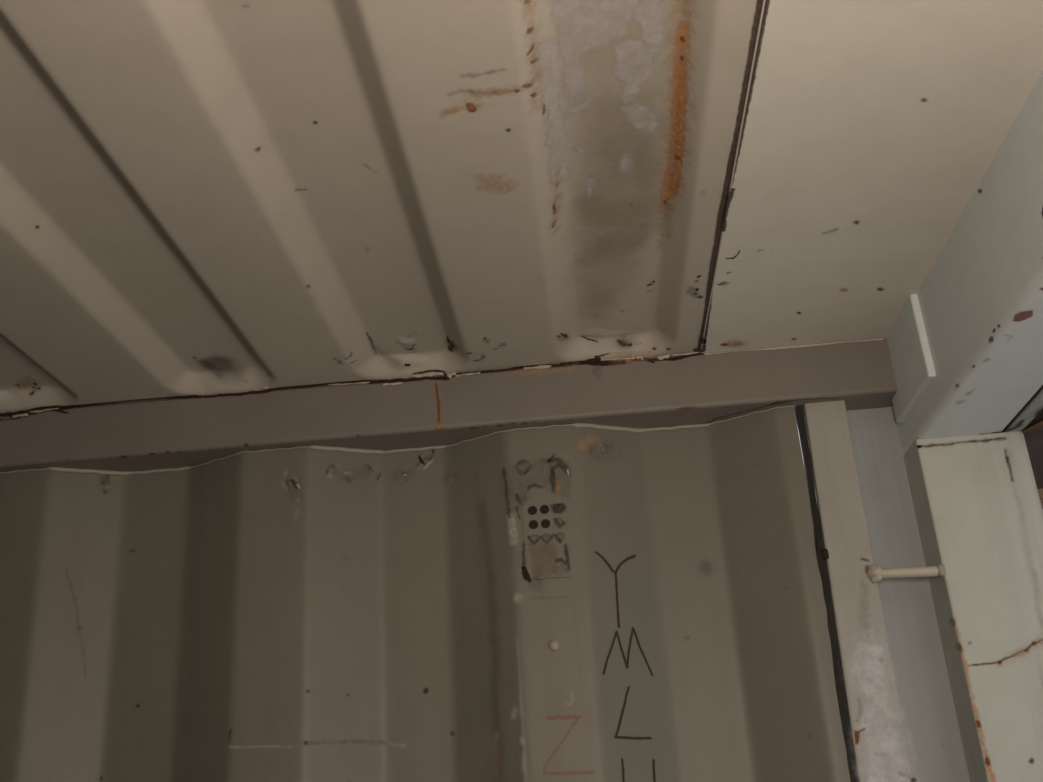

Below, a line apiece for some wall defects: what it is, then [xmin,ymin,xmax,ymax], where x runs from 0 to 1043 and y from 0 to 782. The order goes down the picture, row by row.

rust [662,21,689,204]